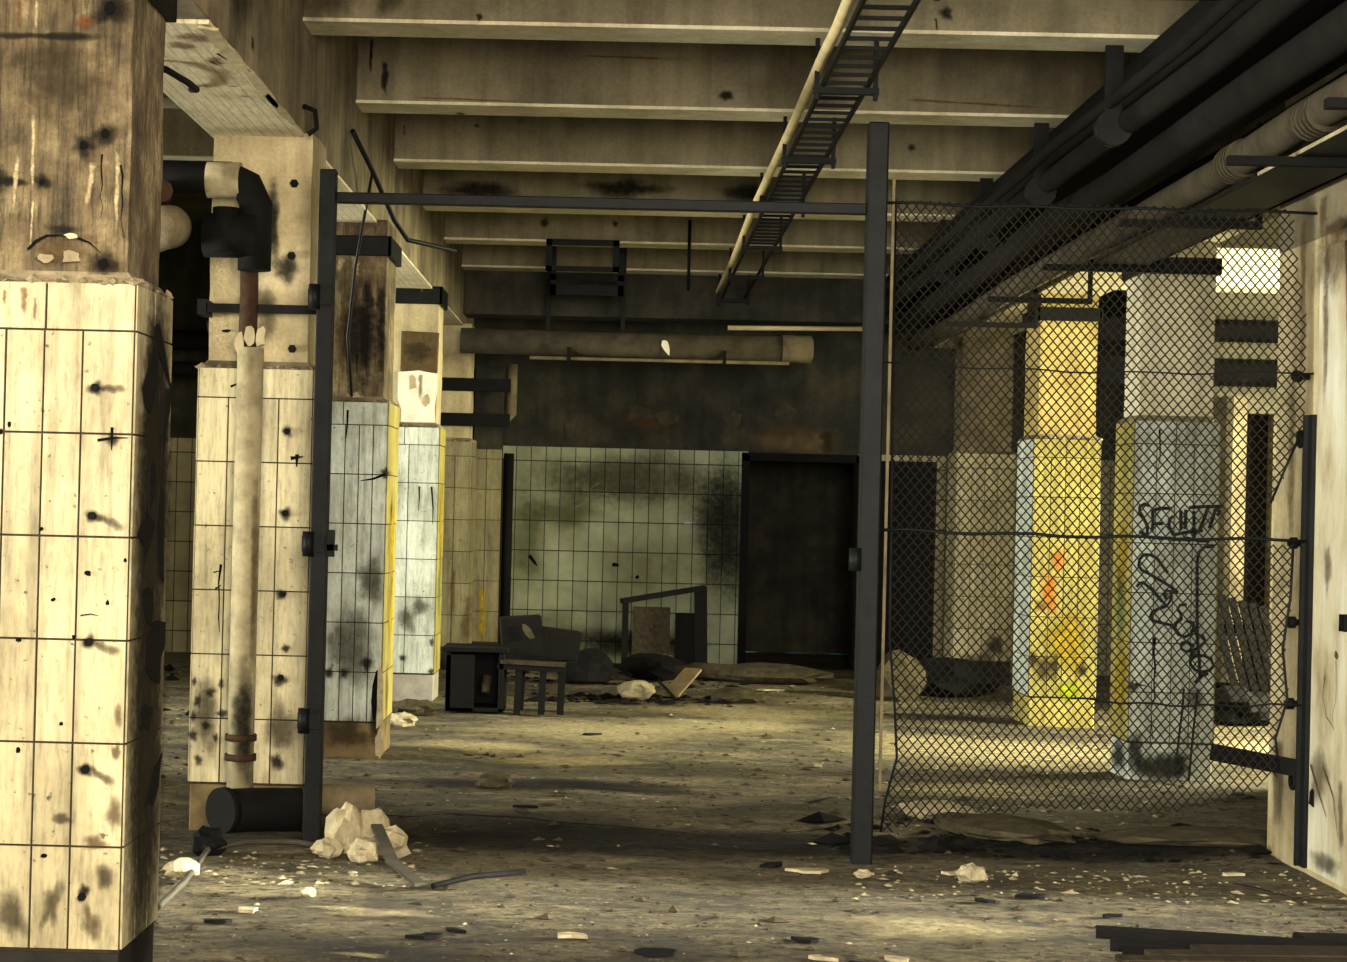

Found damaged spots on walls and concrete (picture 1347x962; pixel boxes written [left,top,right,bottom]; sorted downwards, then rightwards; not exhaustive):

spalling [27,225,118,275]